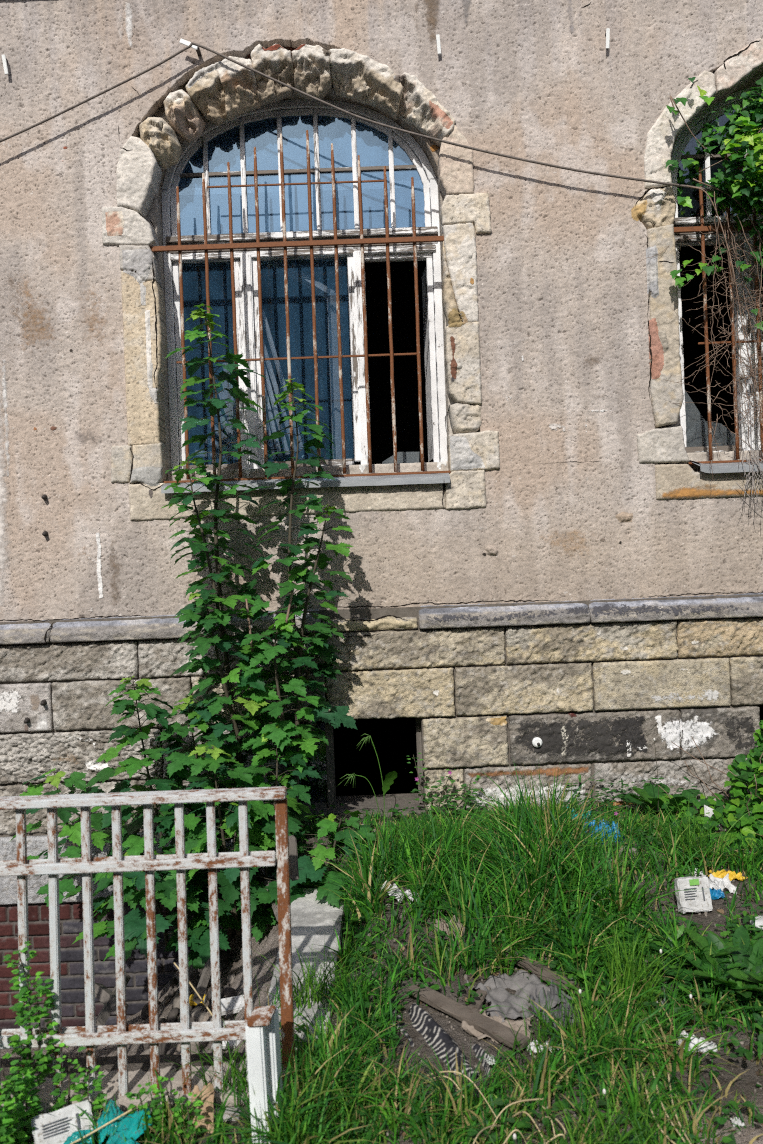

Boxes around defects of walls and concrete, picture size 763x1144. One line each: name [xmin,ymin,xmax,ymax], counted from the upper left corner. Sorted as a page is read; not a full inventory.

spalling [648,318,669,379]
damp [0,360,9,605]
corrosion [663,485,763,498]
damp [651,689,721,702]
damp [655,716,718,753]